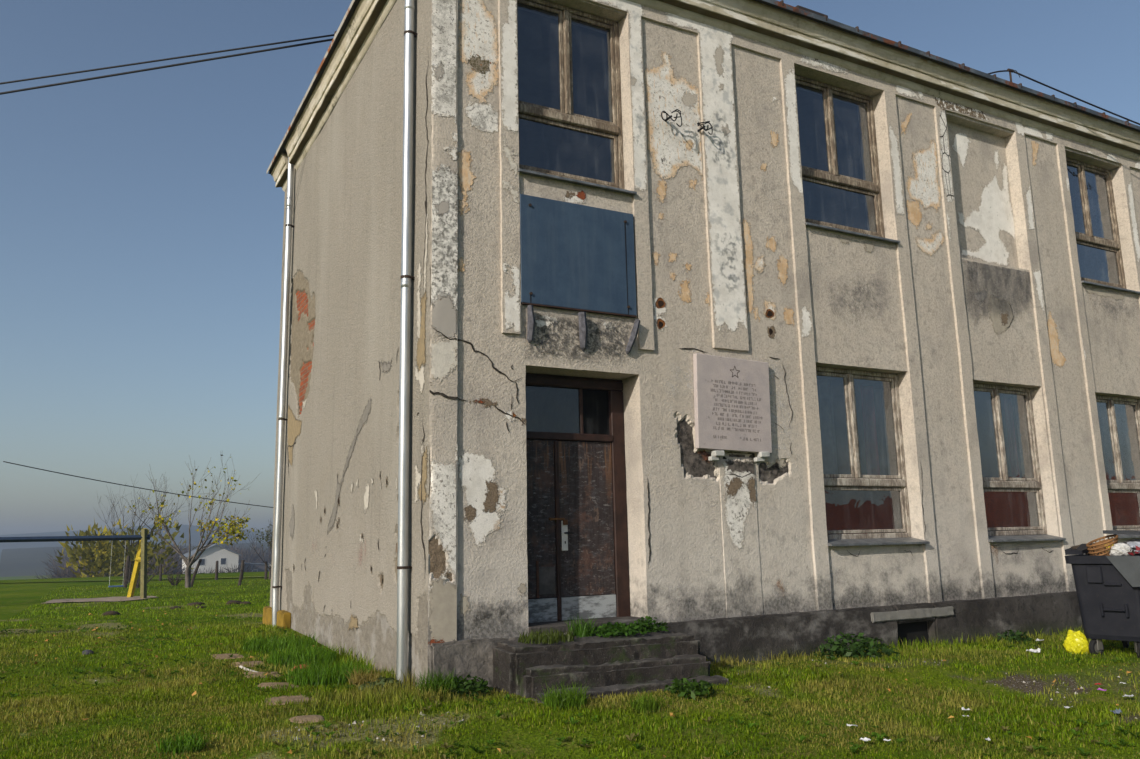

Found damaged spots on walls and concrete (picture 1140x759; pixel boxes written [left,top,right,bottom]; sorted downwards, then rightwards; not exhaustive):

peeling [414,0,520,393]
flaking render [563,189,587,205]
peeling [594,0,813,339]
peeling [888,85,1035,266]
flaking render [290,271,316,418]
crack [430,324,523,431]
leakage [531,318,628,357]
leakage [968,261,1028,310]
crack [417,389,466,576]
peeling [414,444,508,585]
peeling [677,418,788,549]
flaking render [286,563,445,688]